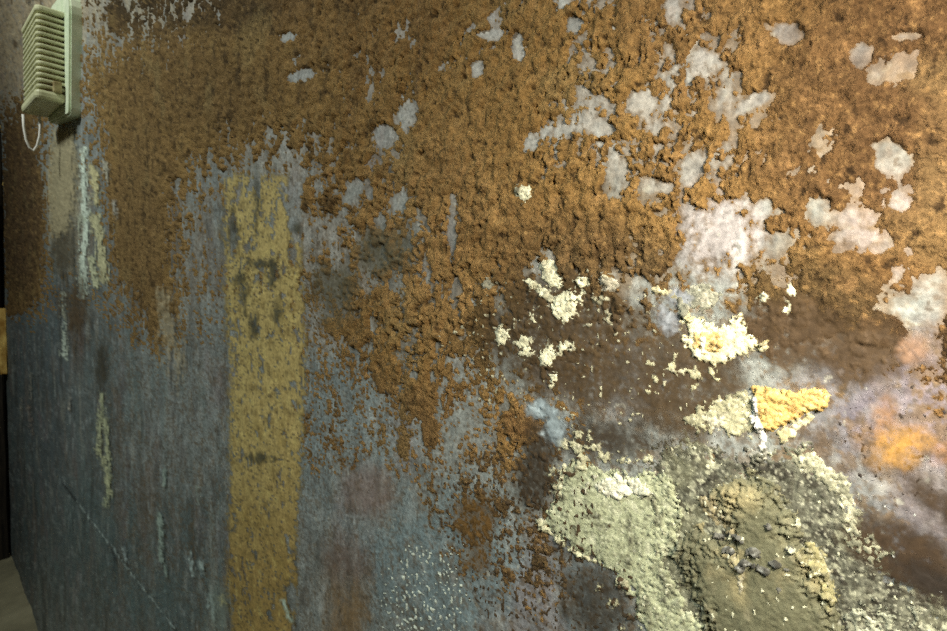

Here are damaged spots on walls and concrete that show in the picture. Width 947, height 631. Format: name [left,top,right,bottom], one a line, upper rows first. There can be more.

rust [195,238,232,313]
rust [639,288,667,341]
rust [724,298,743,323]
rust [883,313,947,418]
rust [550,386,586,442]
water stain [439,269,739,631]
rust [496,521,513,541]
rust [514,493,575,607]
water stain [776,517,823,579]
water stain [795,442,947,631]